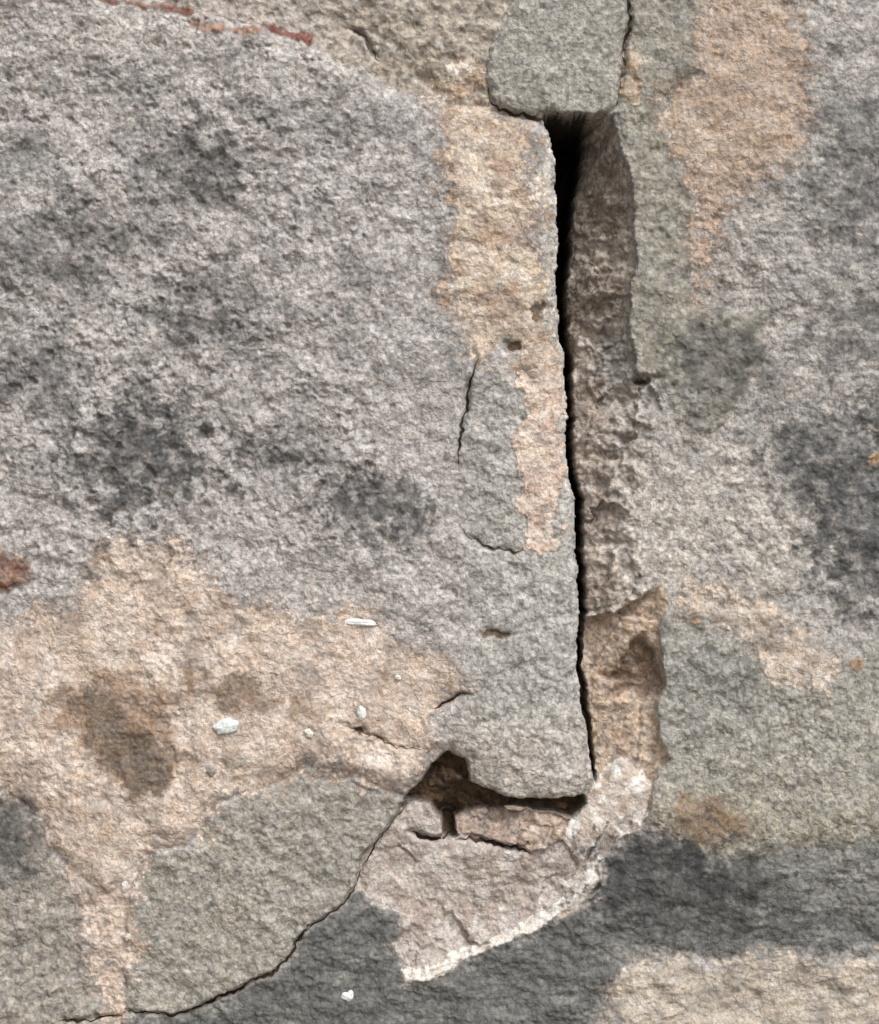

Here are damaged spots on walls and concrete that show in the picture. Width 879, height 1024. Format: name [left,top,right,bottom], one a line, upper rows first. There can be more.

crack [458,359,479,464]
spalling [0,525,603,1024]
crack [56,801,528,1023]